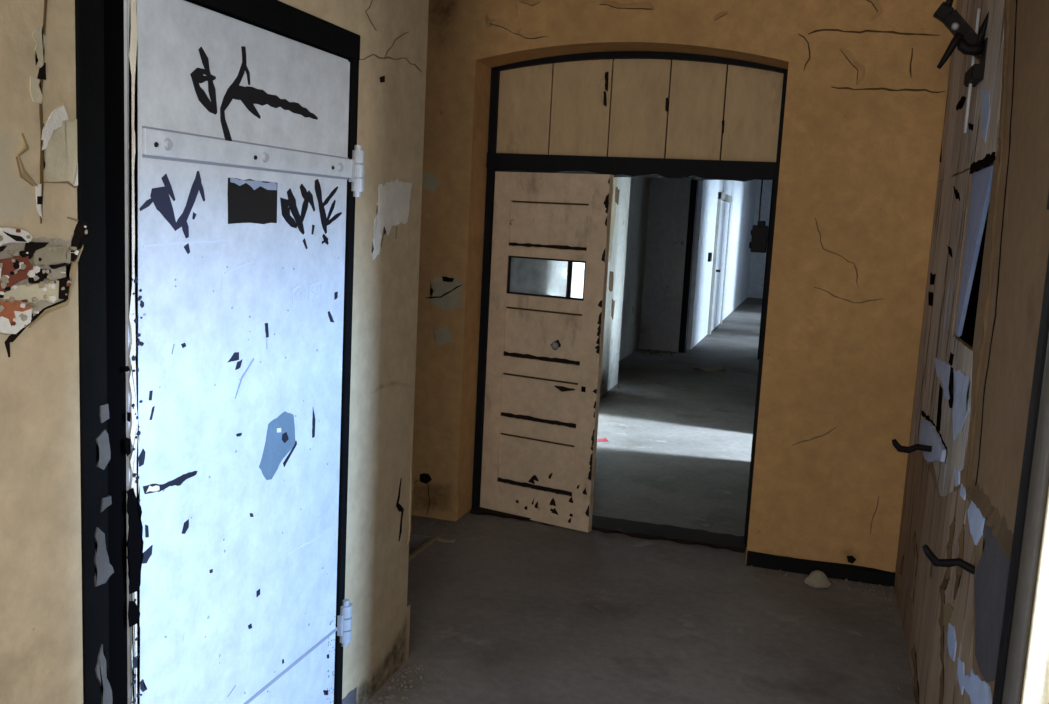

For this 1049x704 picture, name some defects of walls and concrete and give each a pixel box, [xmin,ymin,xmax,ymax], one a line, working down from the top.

crack [798,29,945,93]
spalling [0,103,89,366]
peeling [372,173,440,260]
peeling [894,0,1017,704]